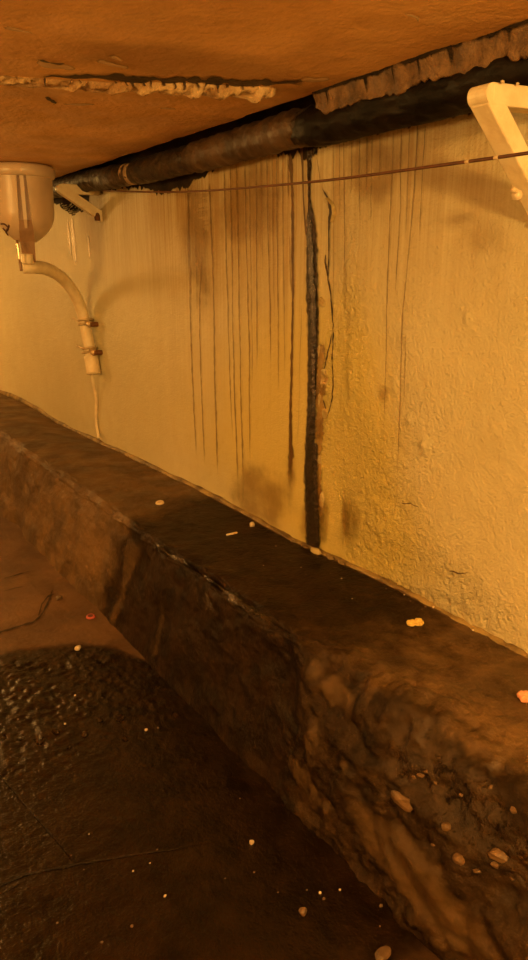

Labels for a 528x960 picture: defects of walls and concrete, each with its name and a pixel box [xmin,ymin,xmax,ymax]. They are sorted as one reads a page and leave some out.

spalling [0,60,276,106]
water stain [57,94,316,178]
spalling [312,19,528,115]
water stain [100,170,278,291]
water stain [228,311,250,423]
water stain [277,146,327,548]
crack [318,168,336,417]